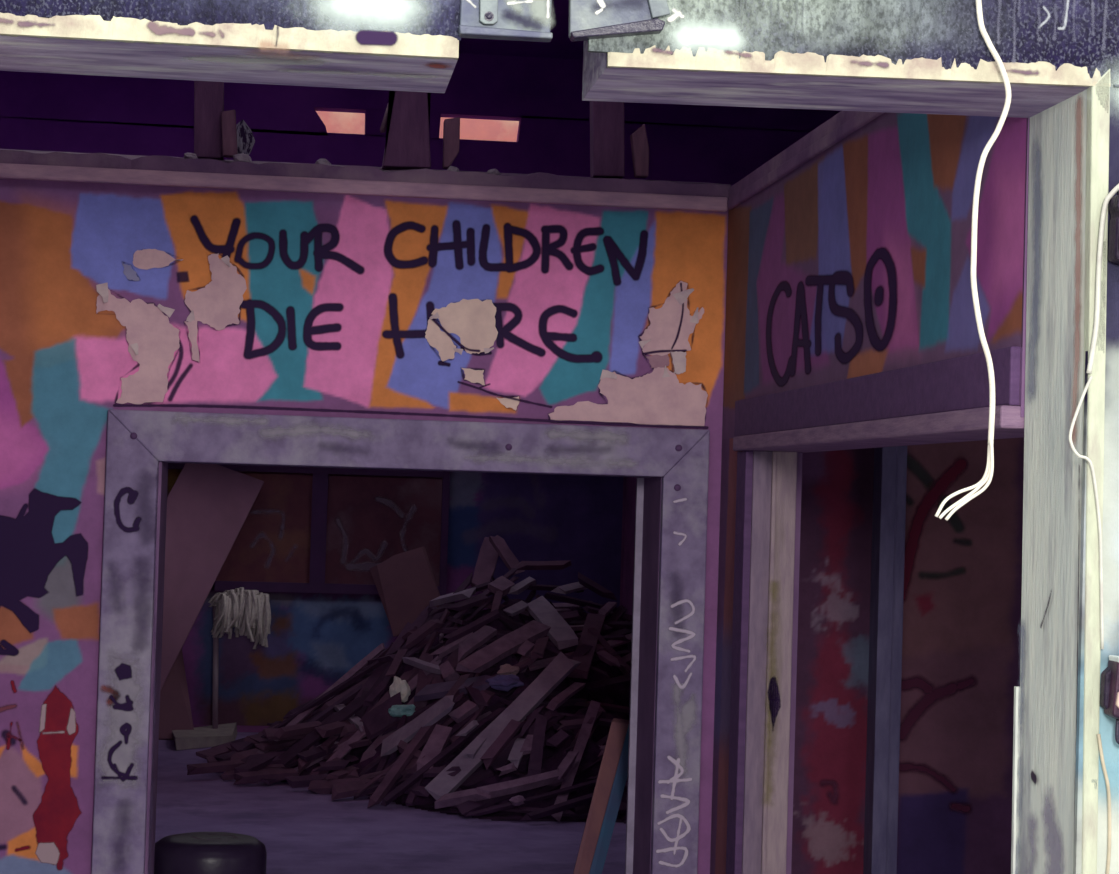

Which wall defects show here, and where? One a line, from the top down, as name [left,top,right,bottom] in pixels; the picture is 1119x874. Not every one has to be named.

peeling [0,18,54,27]
peeling [147,21,224,38]
peeling [96,249,247,404]
peeling [425,299,498,385]
peeling [548,281,708,426]
peeling [496,396,519,410]